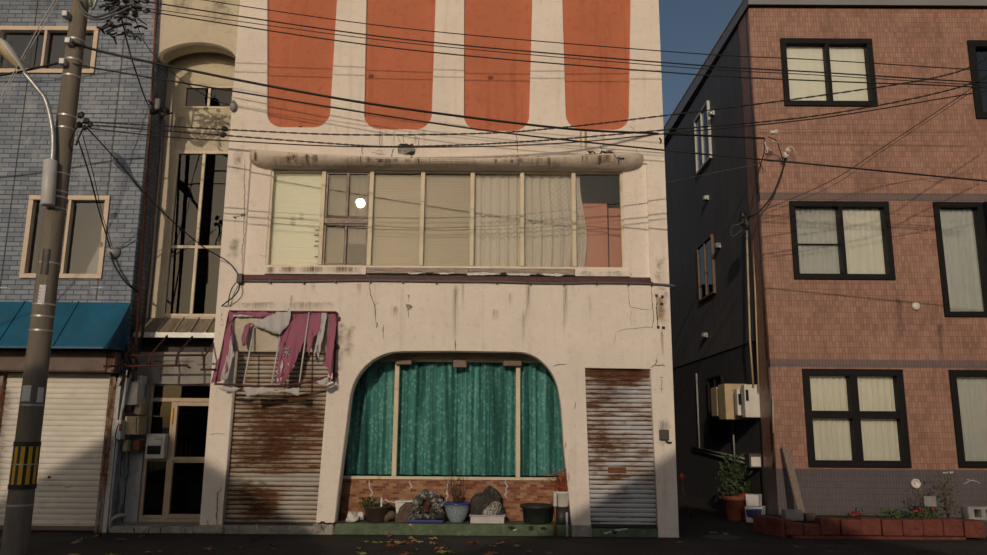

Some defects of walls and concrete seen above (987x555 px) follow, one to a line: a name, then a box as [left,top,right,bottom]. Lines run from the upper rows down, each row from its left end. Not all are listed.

crack [614,273,654,342]